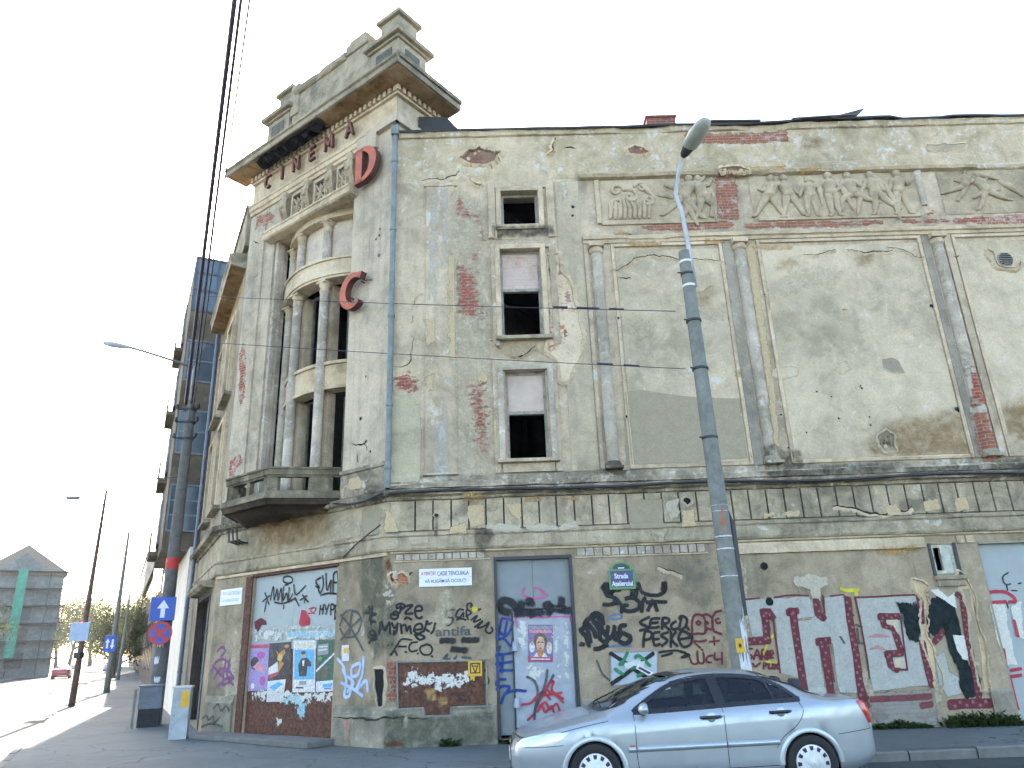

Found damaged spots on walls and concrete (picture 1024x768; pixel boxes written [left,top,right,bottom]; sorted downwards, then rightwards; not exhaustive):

flaking render [702,129,789,144]
crack [422,168,481,190]
flaking render [641,164,883,231]
crack [611,254,723,279]
crack [803,247,925,261]
flaking render [424,144,588,481]
flaking render [238,348,246,404]
flaking render [393,371,434,393]
flaking render [952,366,998,462]
damp [764,417,967,477]
crack [833,505,914,519]
flaking render [383,570,411,606]